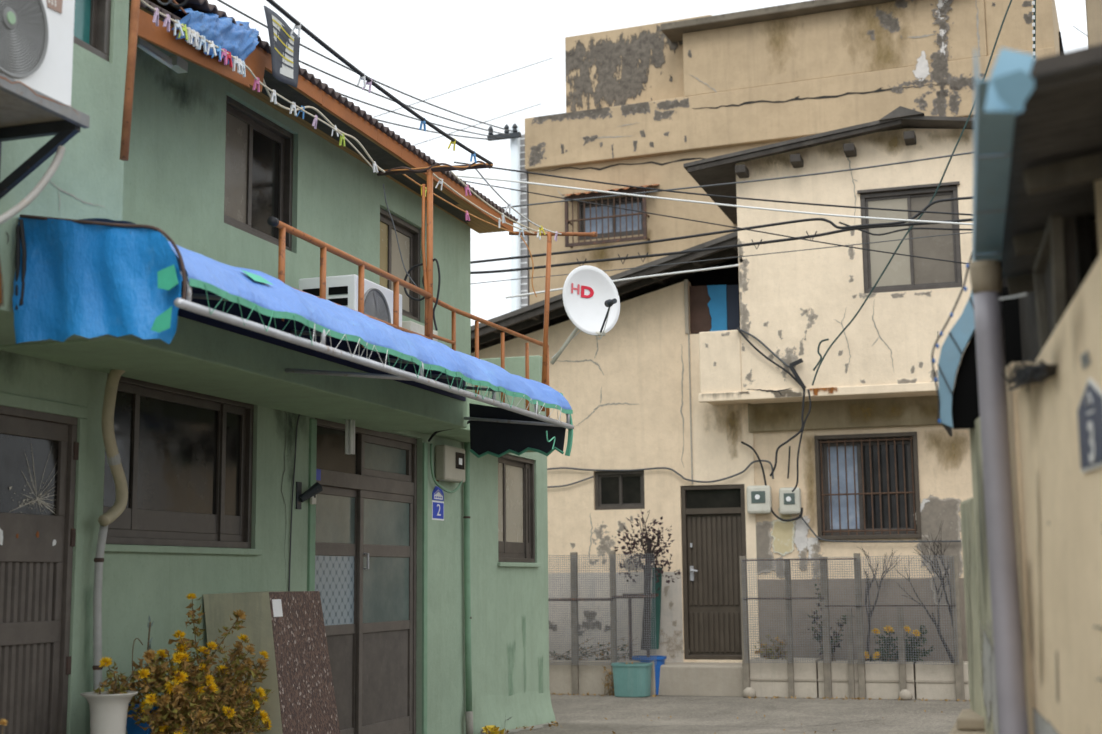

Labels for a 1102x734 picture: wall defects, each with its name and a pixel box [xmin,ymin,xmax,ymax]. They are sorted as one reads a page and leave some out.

peeling [531,25,692,151]
crack [689,74,941,109]
peeling [867,0,917,40]
peeling [889,0,984,117]
peeling [527,142,547,166]
peeling [721,238,818,398]
crack [834,299,894,371]
crack [557,336,635,426]
crack [678,345,686,466]